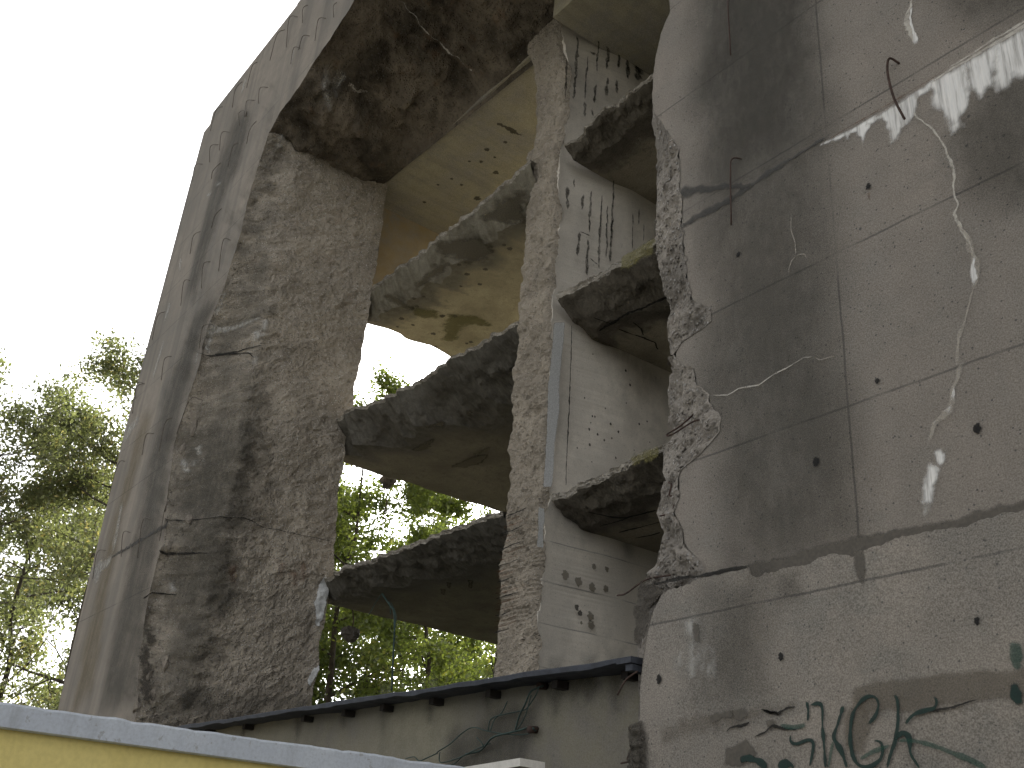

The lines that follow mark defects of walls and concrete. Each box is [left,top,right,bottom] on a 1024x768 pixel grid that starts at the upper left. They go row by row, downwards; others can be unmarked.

water stain [826,21,1024,143]
crack [913,112,979,283]
peeling [544,322,565,487]
spalling [632,139,721,648]
crack [718,365,792,396]
crack [929,331,961,438]
crack [112,516,330,557]
peeling [314,577,329,626]
spalling [139,627,156,701]
peeling [308,666,319,686]